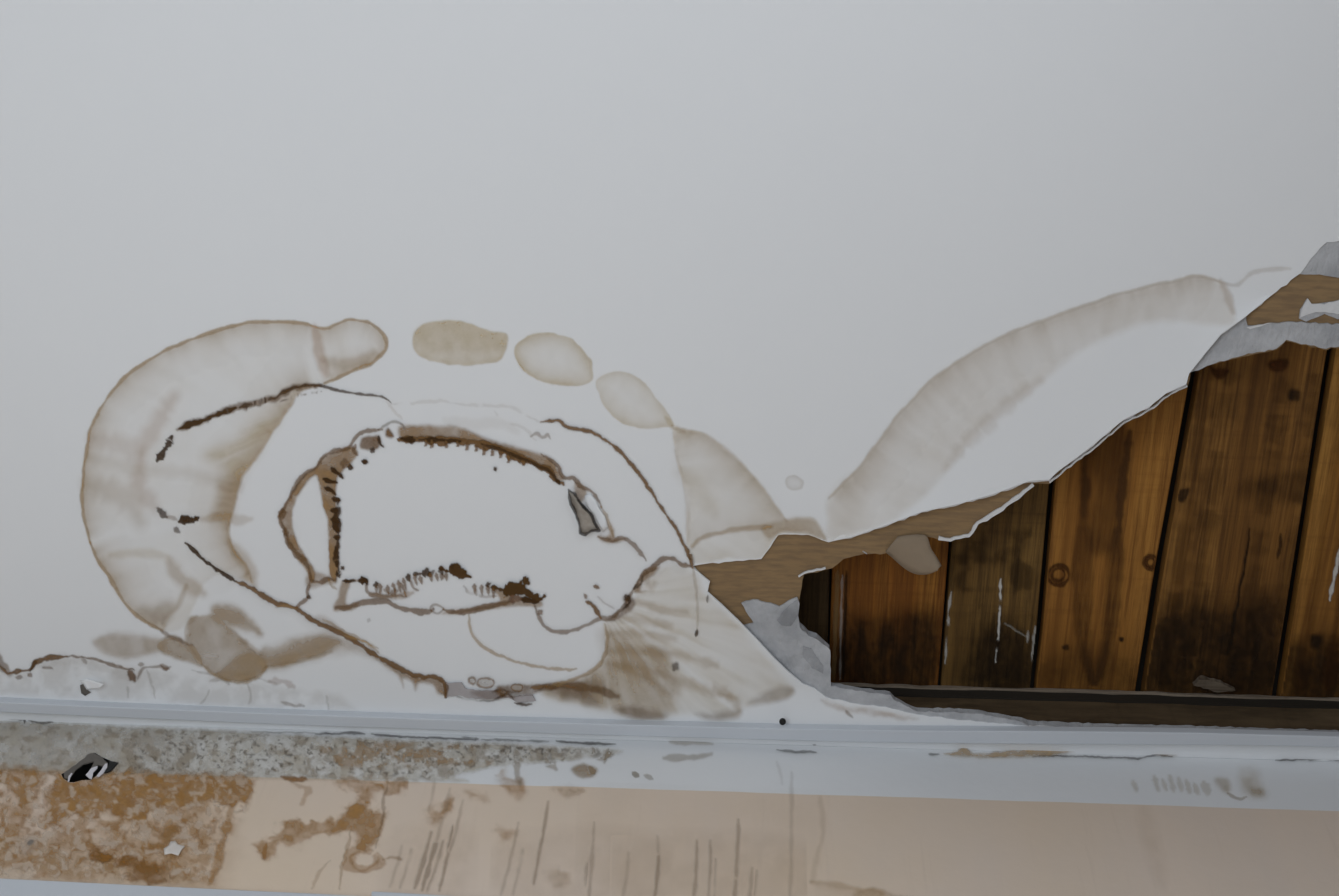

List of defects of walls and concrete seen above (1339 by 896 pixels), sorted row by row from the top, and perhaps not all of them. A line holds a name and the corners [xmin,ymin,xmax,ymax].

damp [81,319,691,704]
hole [64,753,118,782]
peeling [164,841,185,856]